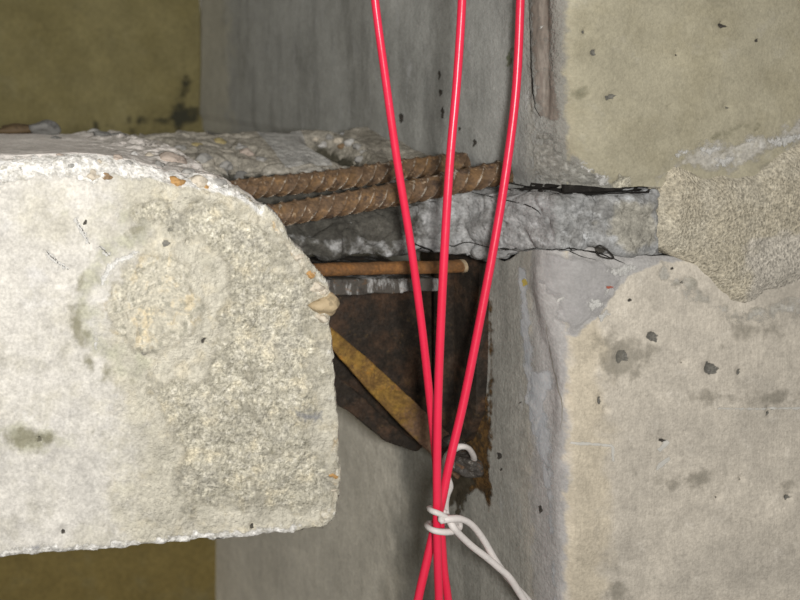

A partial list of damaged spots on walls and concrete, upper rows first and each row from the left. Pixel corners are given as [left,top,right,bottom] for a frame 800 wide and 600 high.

leakage [158,104,199,130]
spalling [531,133,631,188]
peeling [675,120,800,175]
crack [472,181,654,215]
crack [415,242,625,264]
peeling [0,134,514,524]
corrosion [466,378,494,506]